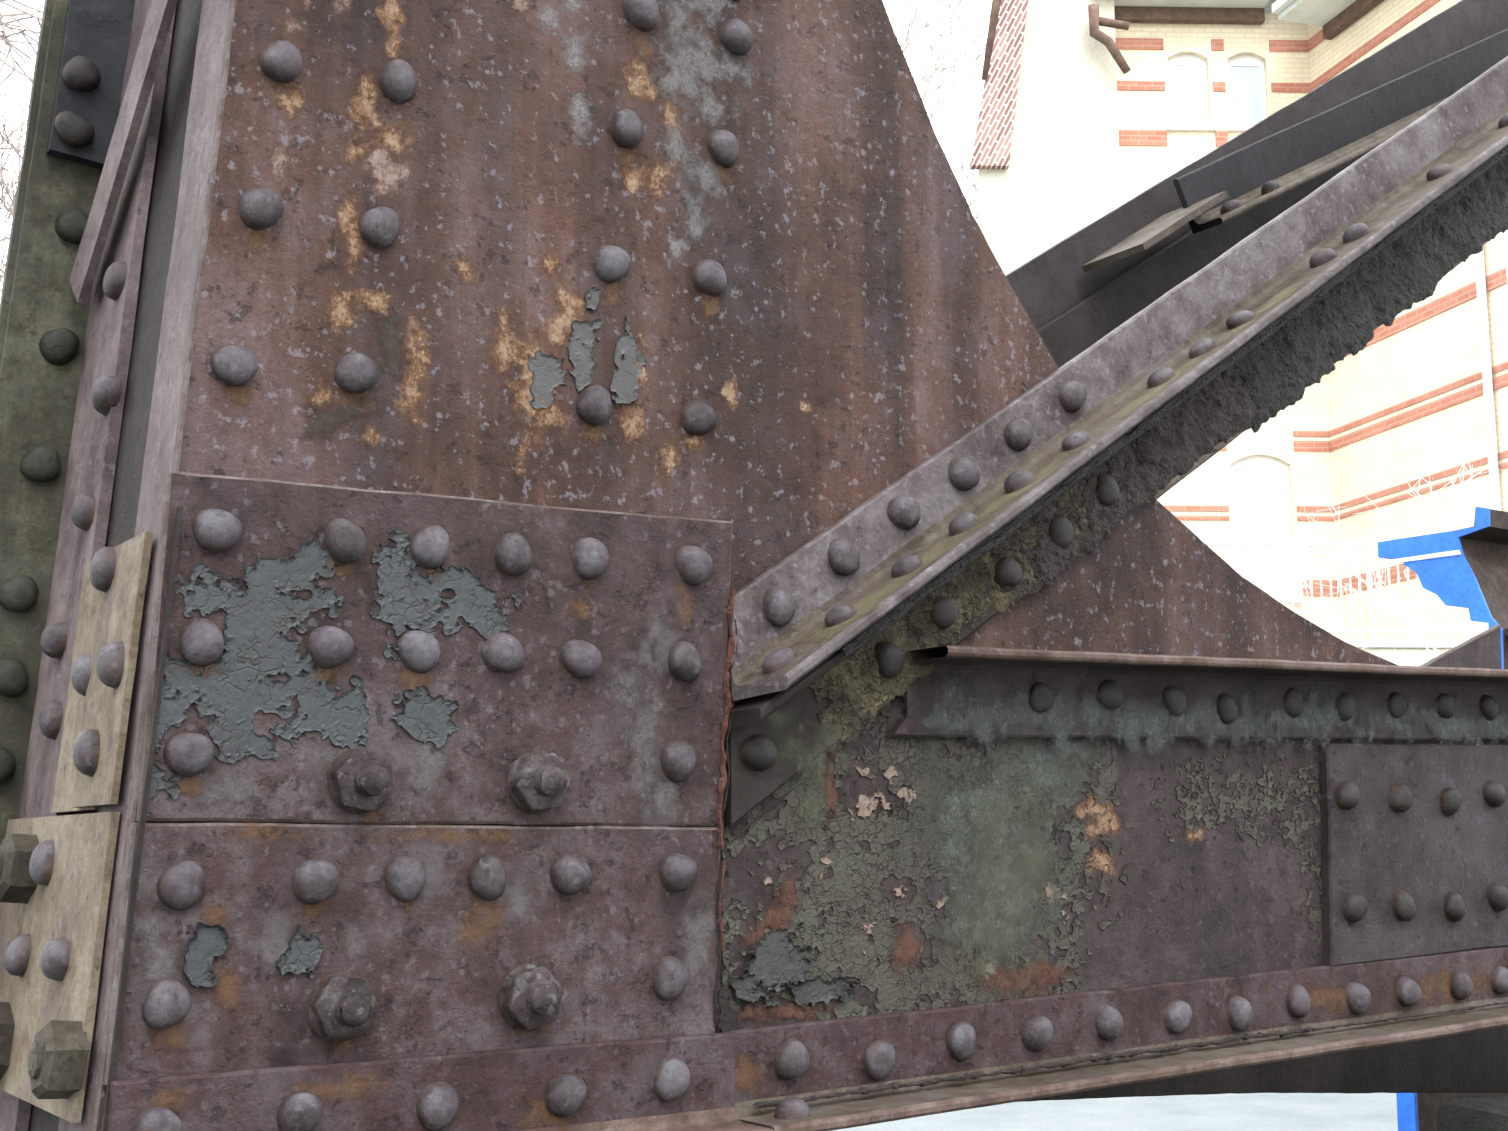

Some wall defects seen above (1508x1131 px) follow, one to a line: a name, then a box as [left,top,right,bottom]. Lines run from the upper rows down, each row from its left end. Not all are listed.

corrosion [376,0,406,58]
corrosion [345,75,415,162]
corrosion [327,197,391,334]
corrosion [395,316,431,423]
corrosion [490,255,617,475]
peeling [528,287,646,409]
leakage [1094,358,1201,434]
leakage [1226,286,1295,338]
peeling [369,530,521,661]
peeling [147,540,370,816]
peeling [721,675,1508,1021]
peeling [182,922,229,987]